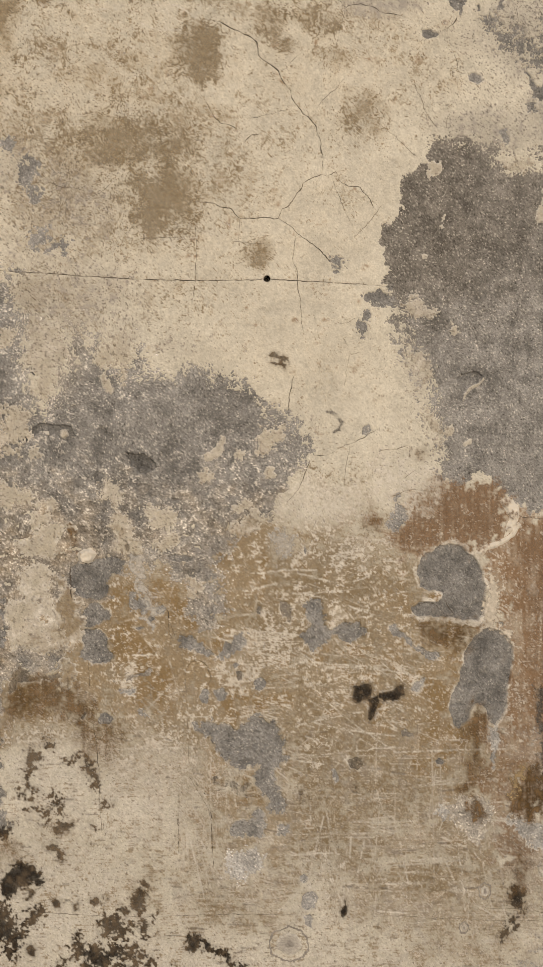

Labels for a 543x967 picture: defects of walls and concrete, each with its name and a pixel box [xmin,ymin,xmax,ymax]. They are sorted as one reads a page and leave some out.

flaking render [448,0,543,113]
crack [0,0,411,328]
flaking render [355,126,543,516]
flaking render [0,262,318,716]
flaking render [280,598,367,653]
leakage [352,684,405,720]
flaking render [411,544,513,770]
leakage [480,567,515,649]
flaking render [191,713,290,887]
leakage [0,860,60,964]
leakage [56,880,159,967]
leakage [185,932,248,967]